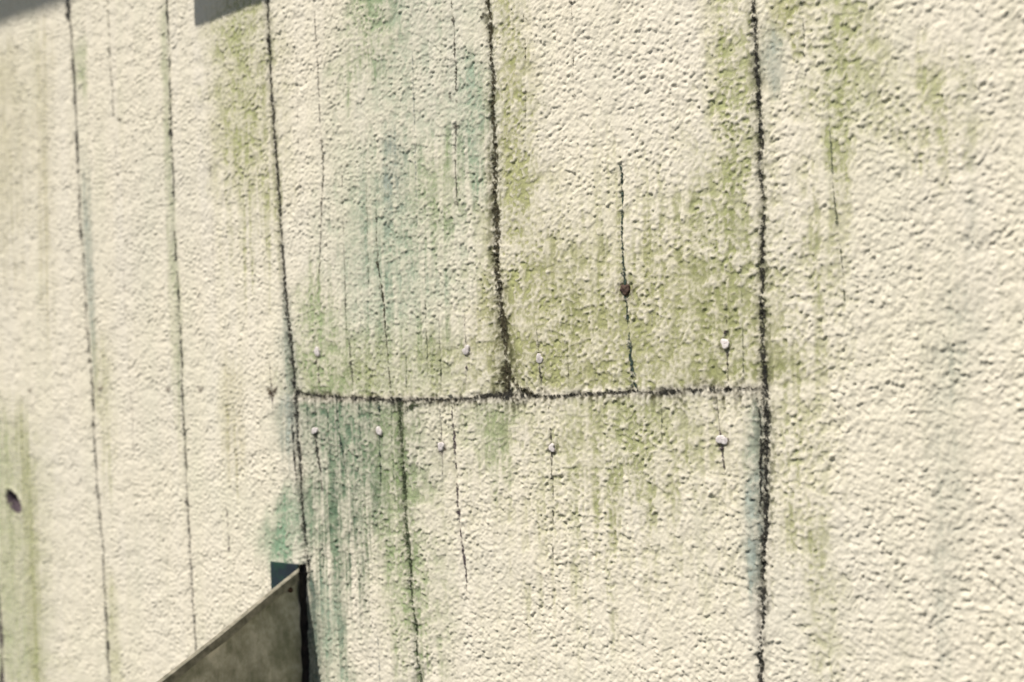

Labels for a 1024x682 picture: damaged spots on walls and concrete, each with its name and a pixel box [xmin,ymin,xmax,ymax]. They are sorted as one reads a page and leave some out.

crack [166,0,175,197]
crack [65,0,110,679]
crack [265,0,771,682]
rust [619,284,632,296]
crack [173,231,197,650]
leakage [745,402,764,593]
leakage [308,576,340,682]